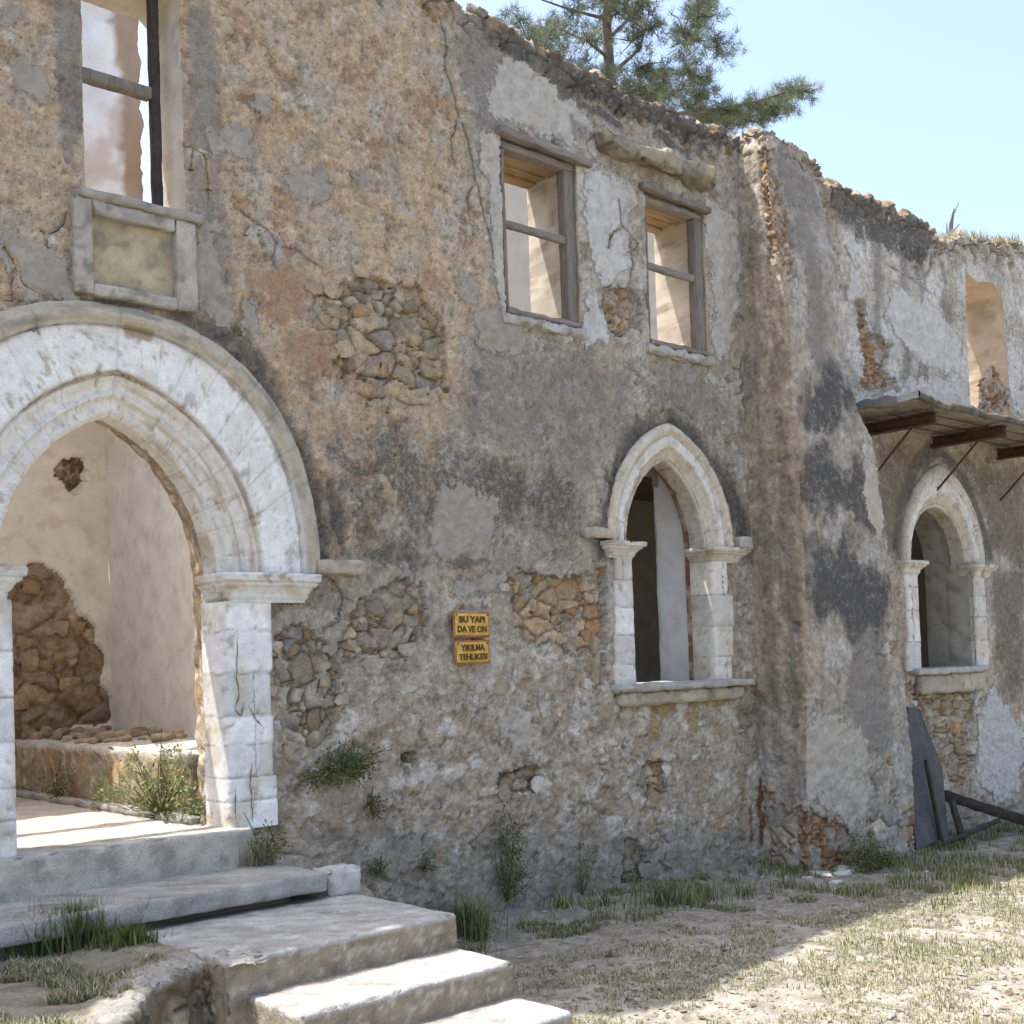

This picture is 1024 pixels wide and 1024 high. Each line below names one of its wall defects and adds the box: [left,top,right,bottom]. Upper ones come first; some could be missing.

crack [435,5,501,298]
flaking render [457,55,640,357]
flaking render [53,457,95,496]
water stain [778,159,1023,698]
flaking render [845,263,1011,434]
flaking render [7,563,111,739]
crack [235,639,263,727]
flaking render [270,579,432,749]
flaking render [425,477,611,801]
water stain [803,533,893,752]
crack [235,768,253,821]
flaking render [797,711,870,871]